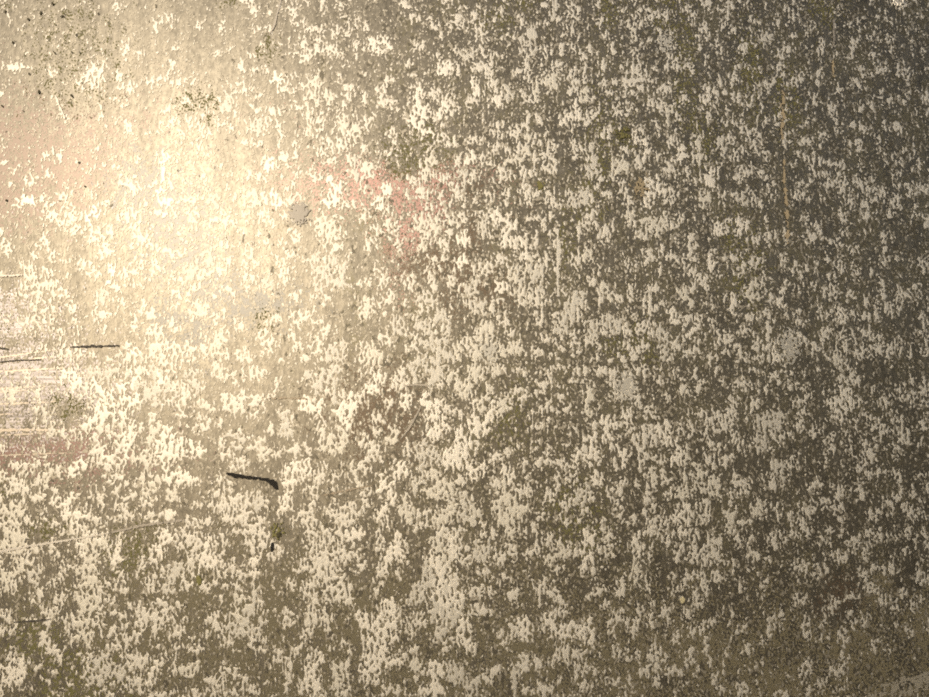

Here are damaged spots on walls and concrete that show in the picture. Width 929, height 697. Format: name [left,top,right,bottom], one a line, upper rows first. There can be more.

spalling [226,472,278,490]